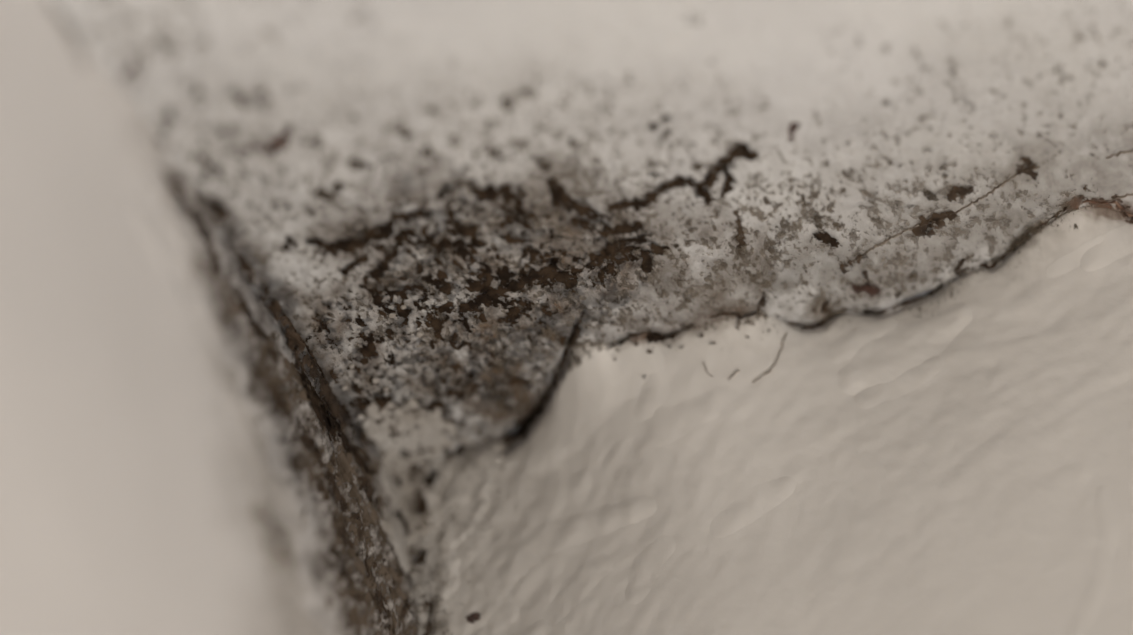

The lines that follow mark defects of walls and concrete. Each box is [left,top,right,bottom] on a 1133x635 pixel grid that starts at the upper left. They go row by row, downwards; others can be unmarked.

leakage [882,16,1133,159]
peeling [972,241,1011,261]
peeling [924,261,951,290]
peeling [770,284,817,322]
peeling [877,293,905,313]
leakage [155,56,1096,635]